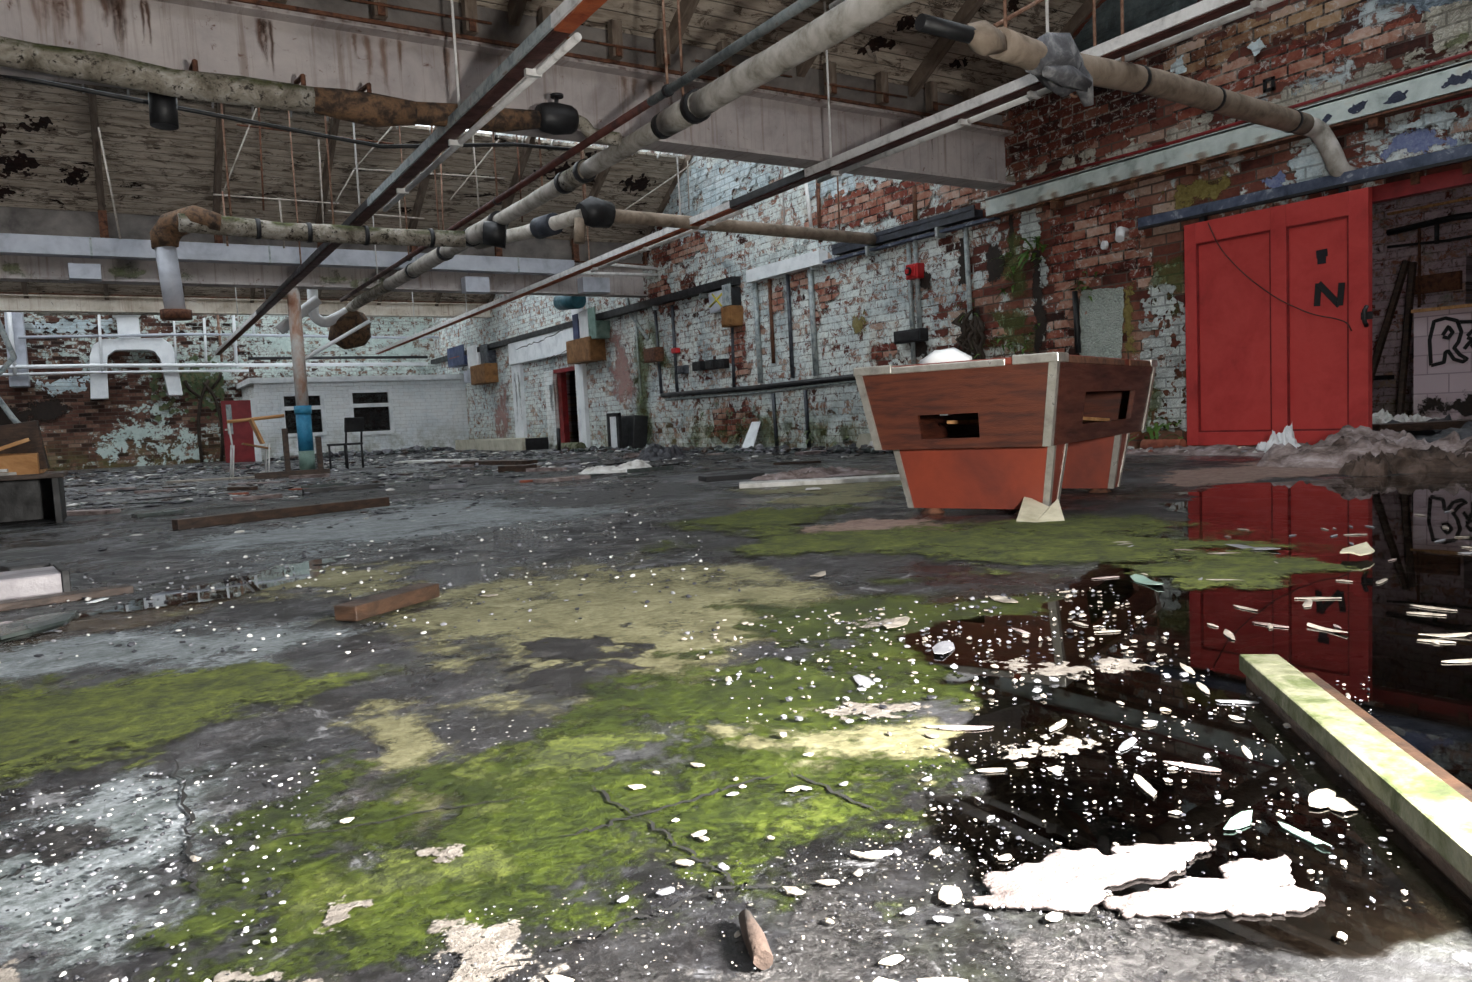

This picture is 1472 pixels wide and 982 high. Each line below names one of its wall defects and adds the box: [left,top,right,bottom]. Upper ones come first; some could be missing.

peeling [1074,0,1203,52]
spalling [1128,0,1472,123]
spalling [1004,86,1250,187]
peeling [92,401,213,466]
leakage [0,455,902,711]
leakage [329,699,446,772]
crack [0,853,70,880]
leakage [0,765,230,982]
crack [121,759,201,893]
leakage [393,786,456,834]
peeling [939,810,1332,920]
peeling [1308,789,1358,812]